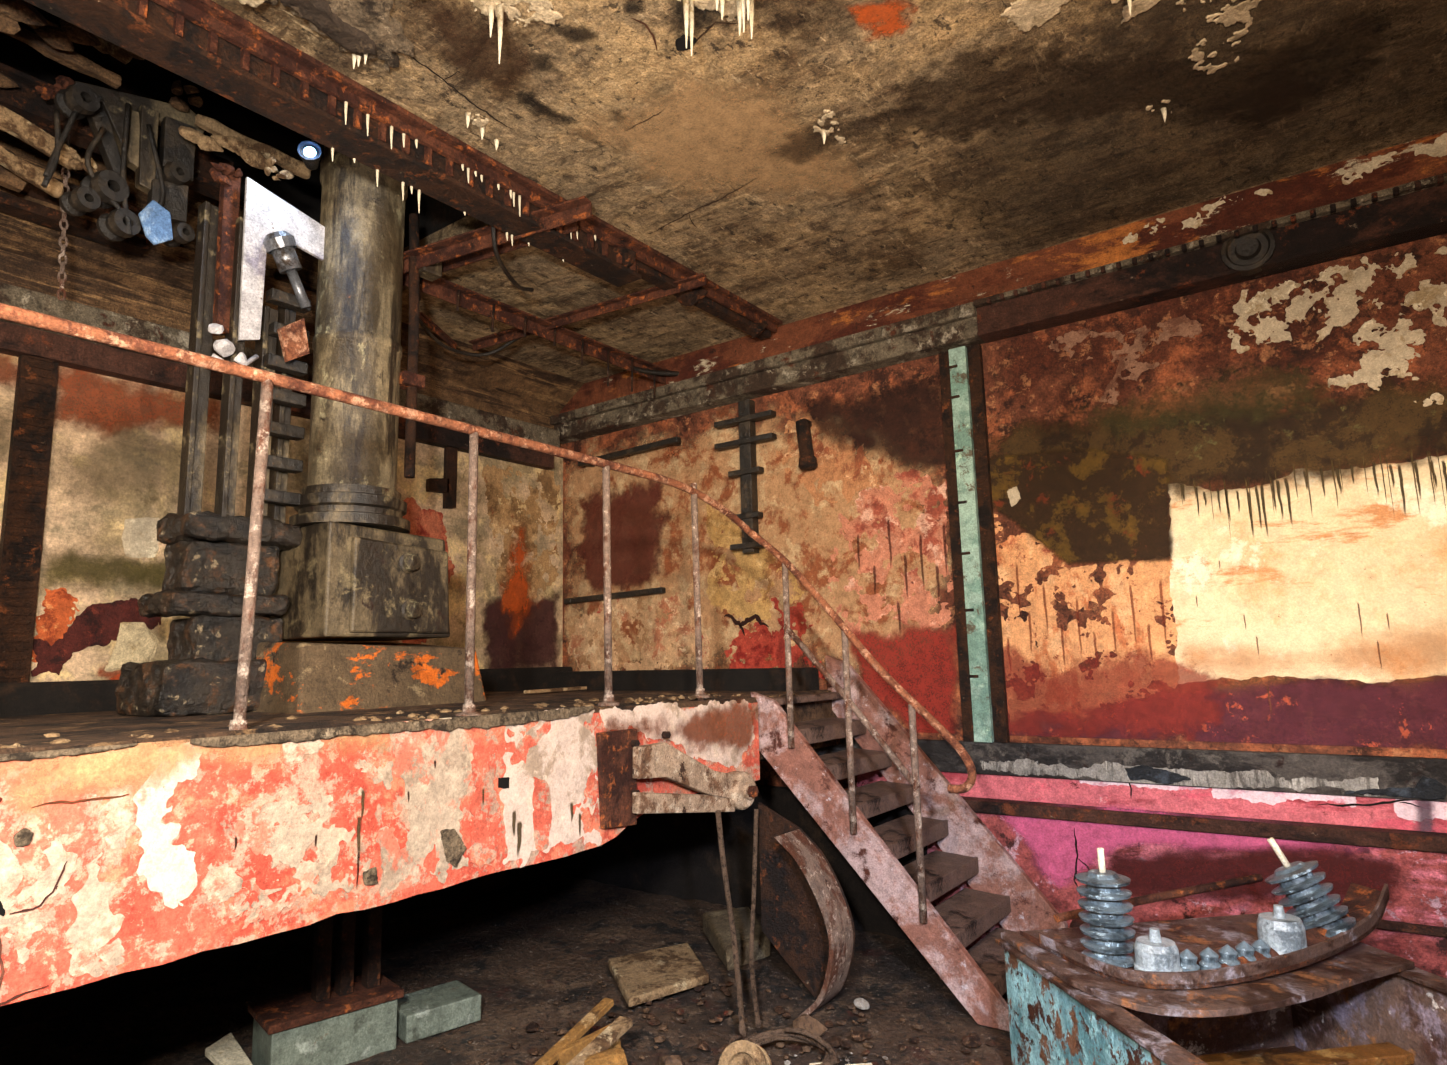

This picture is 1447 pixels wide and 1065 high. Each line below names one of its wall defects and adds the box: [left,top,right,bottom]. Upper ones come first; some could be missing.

leakage [674,0,754,56]
rust [849,1,908,35]
leakage [415,0,597,142]
leakage [465,112,499,150]
peeling [1342,151,1397,185]
peeling [1414,133,1447,157]
peeling [1228,252,1447,391]
peeling [1414,393,1444,407]
leakage [990,384,1447,563]
peeling [0,699,755,977]
crack [0,861,67,1005]